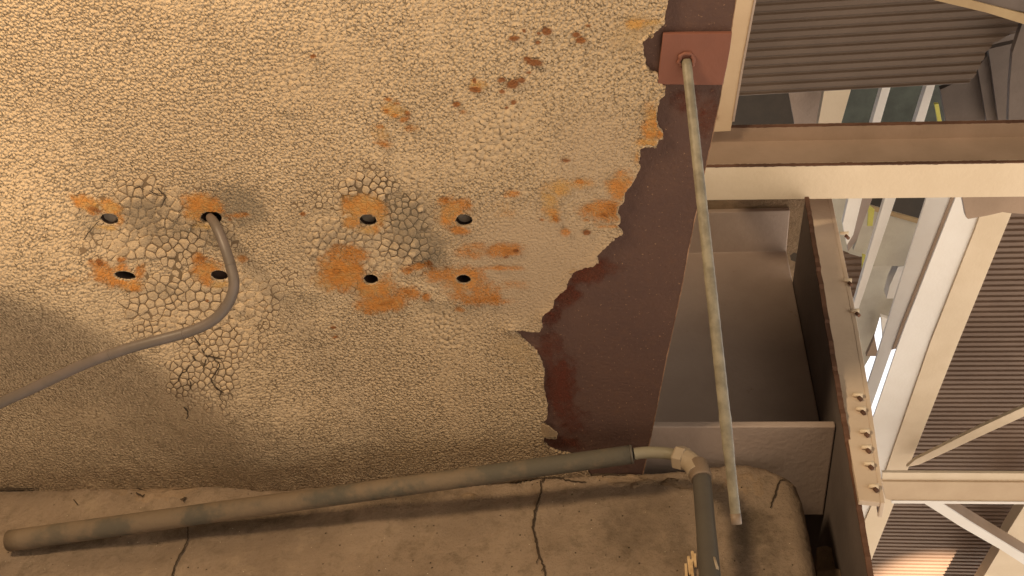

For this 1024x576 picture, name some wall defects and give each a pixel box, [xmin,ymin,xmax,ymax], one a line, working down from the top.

rust [637,110,663,159]
rust [71,195,124,230]
rust [184,194,248,229]
rust [343,194,386,233]
rust [582,171,633,235]
rust [89,257,143,291]
crack [68,158,446,419]
rust [318,245,430,314]
rust [402,244,521,311]
rust [544,261,610,325]
peeling [541,424,558,437]
crack [531,478,546,576]